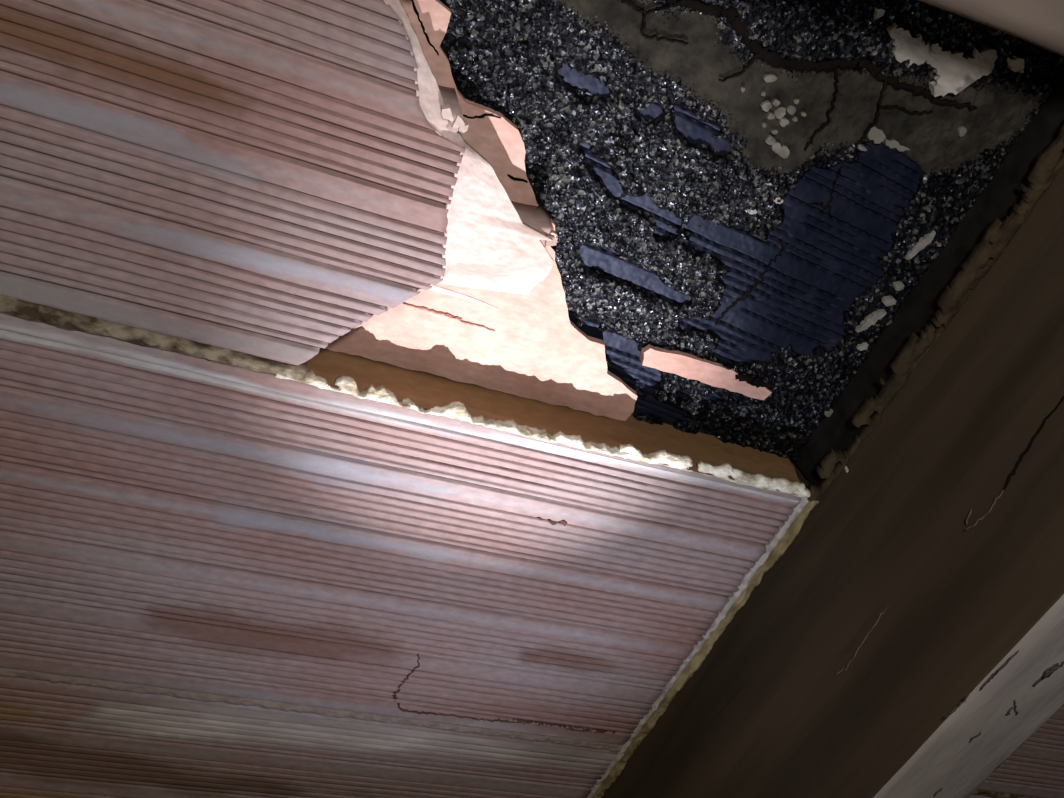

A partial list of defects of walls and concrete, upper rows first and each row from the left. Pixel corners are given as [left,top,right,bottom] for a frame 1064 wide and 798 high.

spalling [383,0,558,308]
flaking render [874,7,1024,97]
spalling [807,123,1064,502]
crack [392,653,616,734]